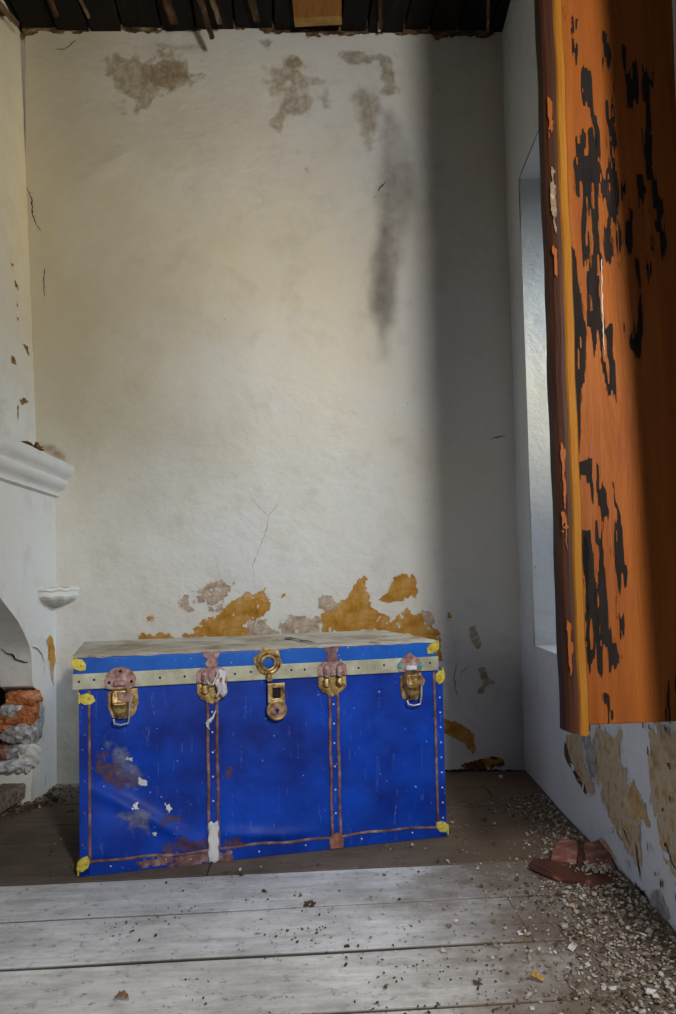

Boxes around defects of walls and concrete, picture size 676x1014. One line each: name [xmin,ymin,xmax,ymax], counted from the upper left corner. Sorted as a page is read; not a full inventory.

peeling [135,572,452,664]
peeling [444,718,508,778]
peeling [529,678,676,921]